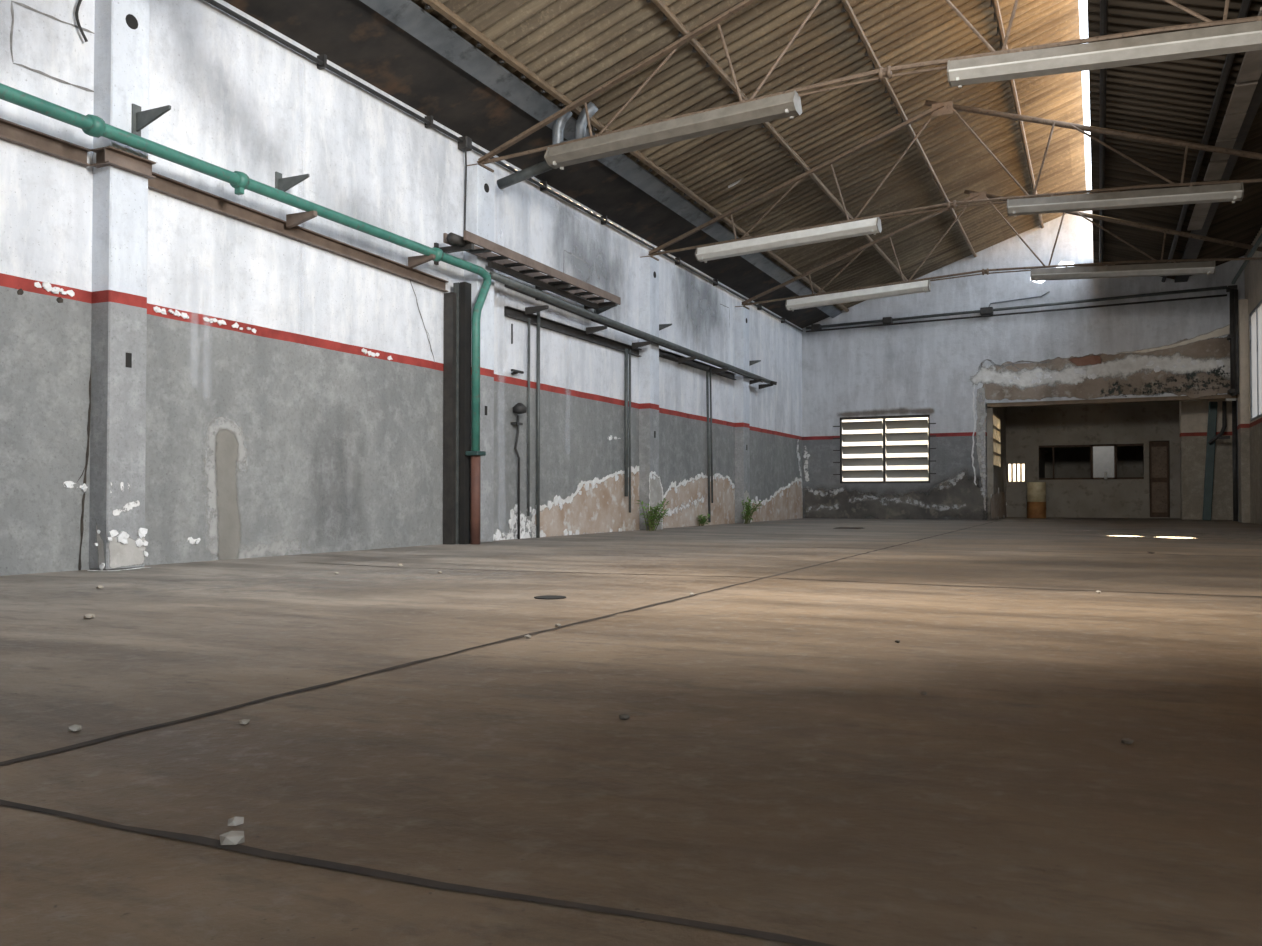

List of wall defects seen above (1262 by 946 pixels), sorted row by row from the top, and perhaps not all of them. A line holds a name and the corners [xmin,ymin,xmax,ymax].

flaking render [971,325,1230,519]
spalling [63,481,88,492]
peeling [94,482,148,570]
flaking render [493,439,810,541]